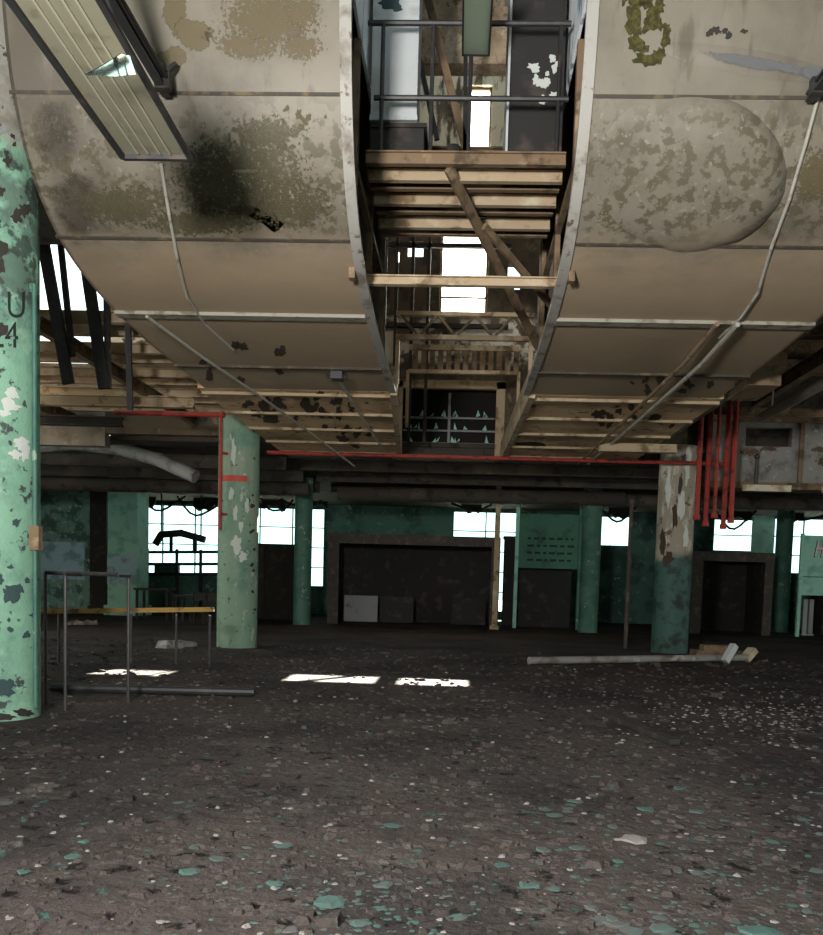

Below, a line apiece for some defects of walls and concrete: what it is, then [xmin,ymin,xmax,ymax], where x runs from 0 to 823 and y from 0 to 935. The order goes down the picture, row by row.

peeling [622,0,671,67]
peeling [706,26,748,39]
peeling [527,54,558,105]
peeling [0,204,31,225]
peeling [0,240,9,273]
peeling [0,387,22,417]
peeling [241,391,372,449]
peeling [8,436,30,462]
peeling [659,446,692,565]
peeling [0,564,30,604]
peeling [0,679,16,697]
spalling [0,708,34,720]